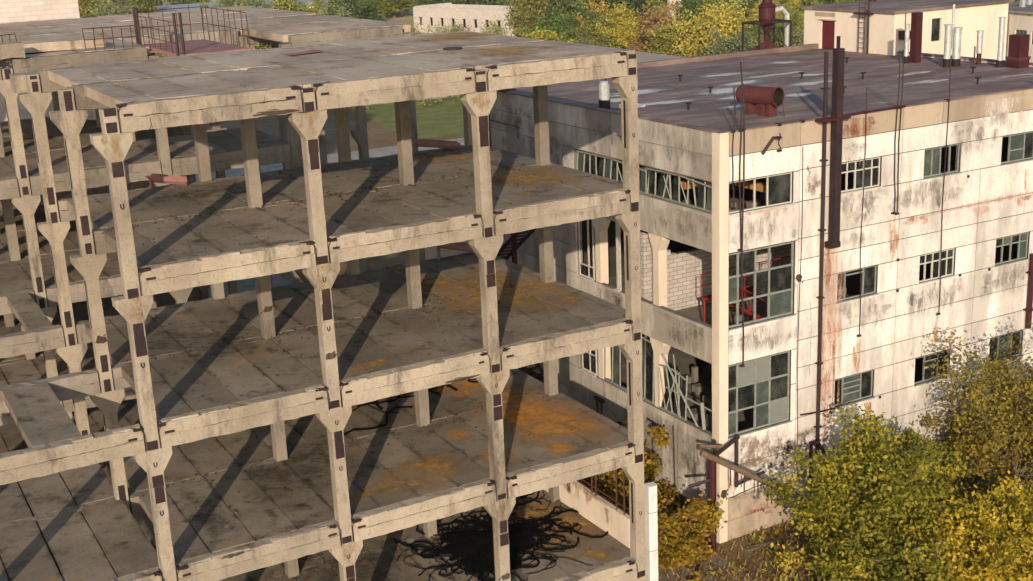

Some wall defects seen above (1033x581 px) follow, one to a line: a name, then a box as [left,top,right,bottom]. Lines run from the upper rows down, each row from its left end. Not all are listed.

corrosion [821,248,860,408]